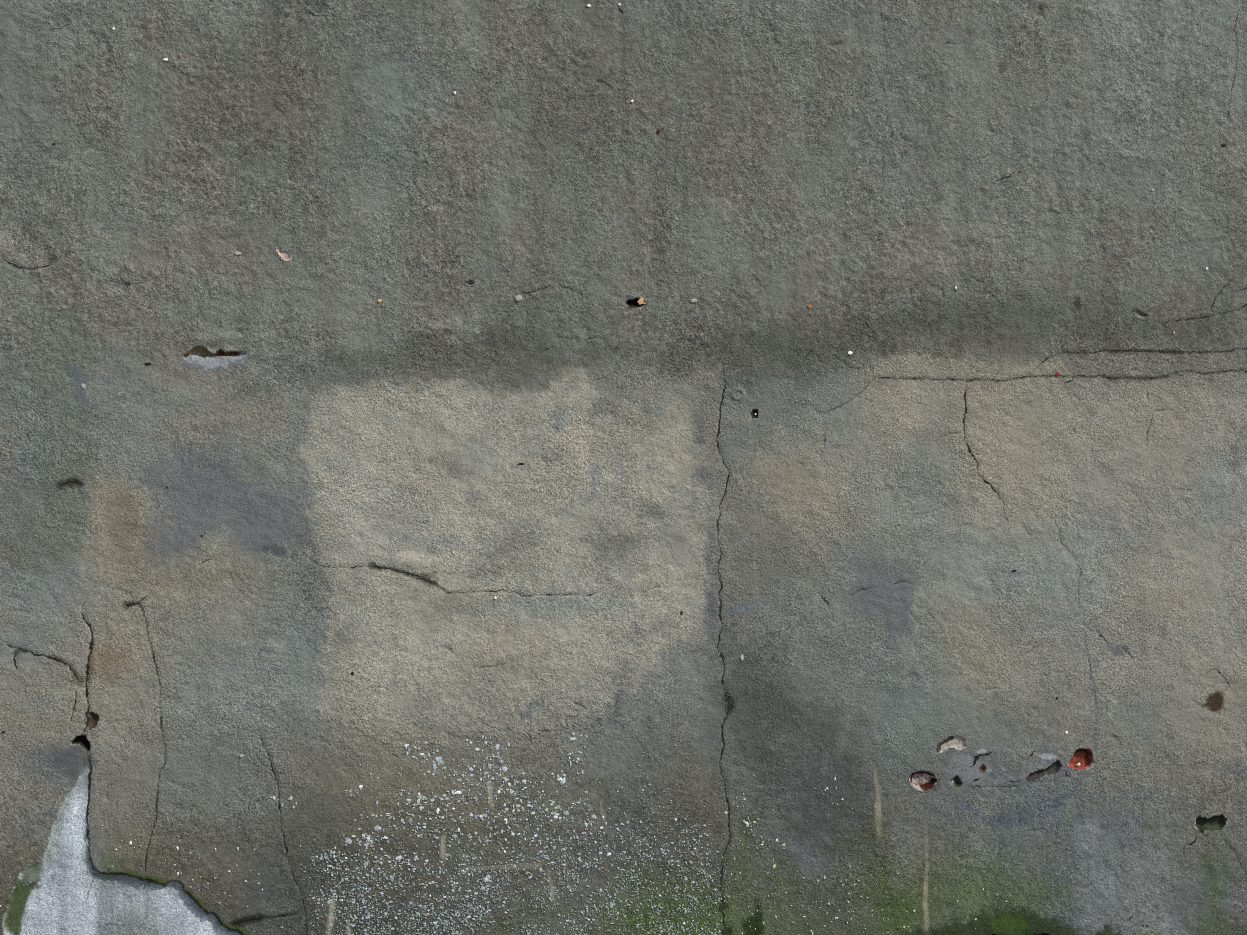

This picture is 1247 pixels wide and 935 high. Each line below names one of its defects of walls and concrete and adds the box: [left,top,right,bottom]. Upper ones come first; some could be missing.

spalling [181,346,245,371]
crack [822,271,1247,715]
crack [301,552,601,596]
crack [6,595,94,735]
crack [717,368,732,926]
crack [127,595,167,868]
spalling [909,735,1095,792]
peeling [2,712,250,935]
spalling [1194,814,1227,833]
damp [327,899,351,935]
spalling [912,907,1122,935]